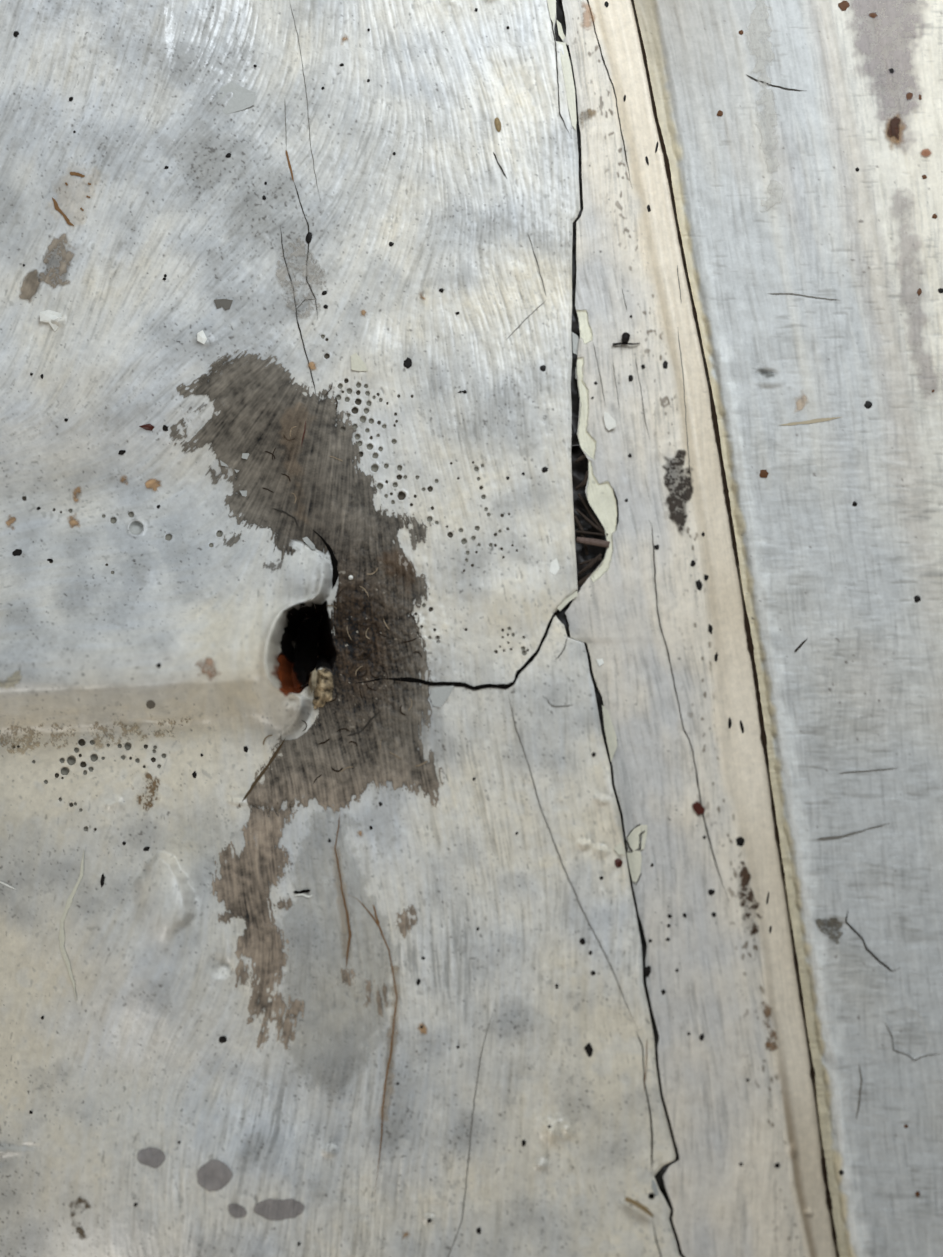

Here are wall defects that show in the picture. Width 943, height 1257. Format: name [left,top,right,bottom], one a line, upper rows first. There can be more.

water stain [167,351,443,1049]
crack [358,0,685,1257]
crack [632,0,841,1257]
crack [855,1065,863,1119]